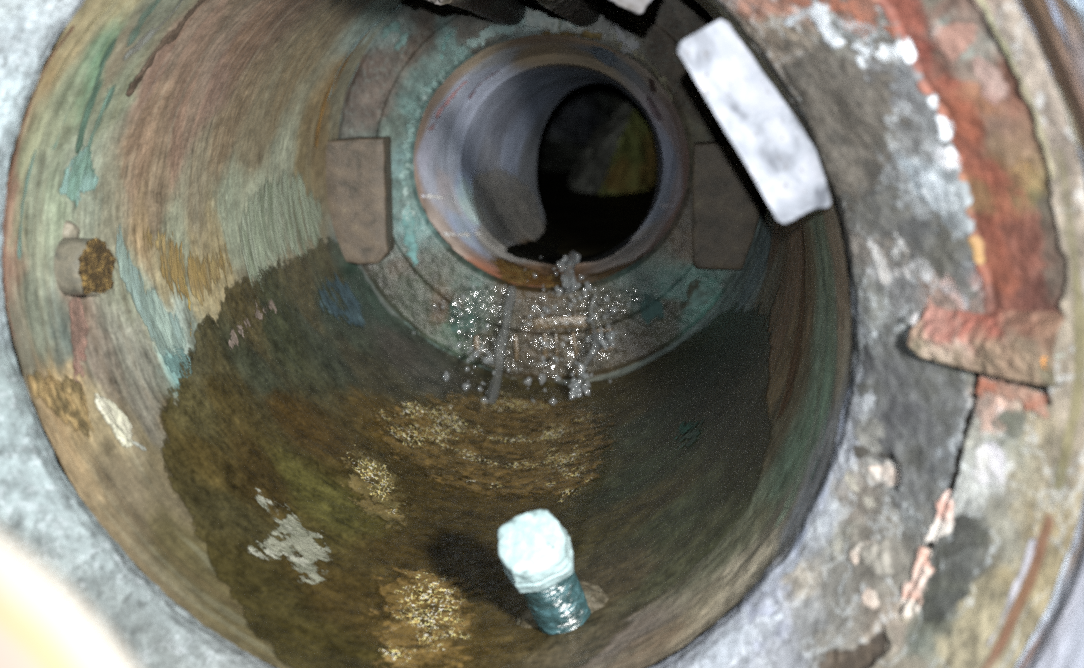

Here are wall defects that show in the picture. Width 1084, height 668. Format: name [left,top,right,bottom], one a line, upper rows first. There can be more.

corrosion [780,0,897,41]
leakage [782,2,984,311]
leakage [758,222,1028,623]
crack [921,357,1050,498]
peeling [895,490,954,622]
crack [927,536,939,560]